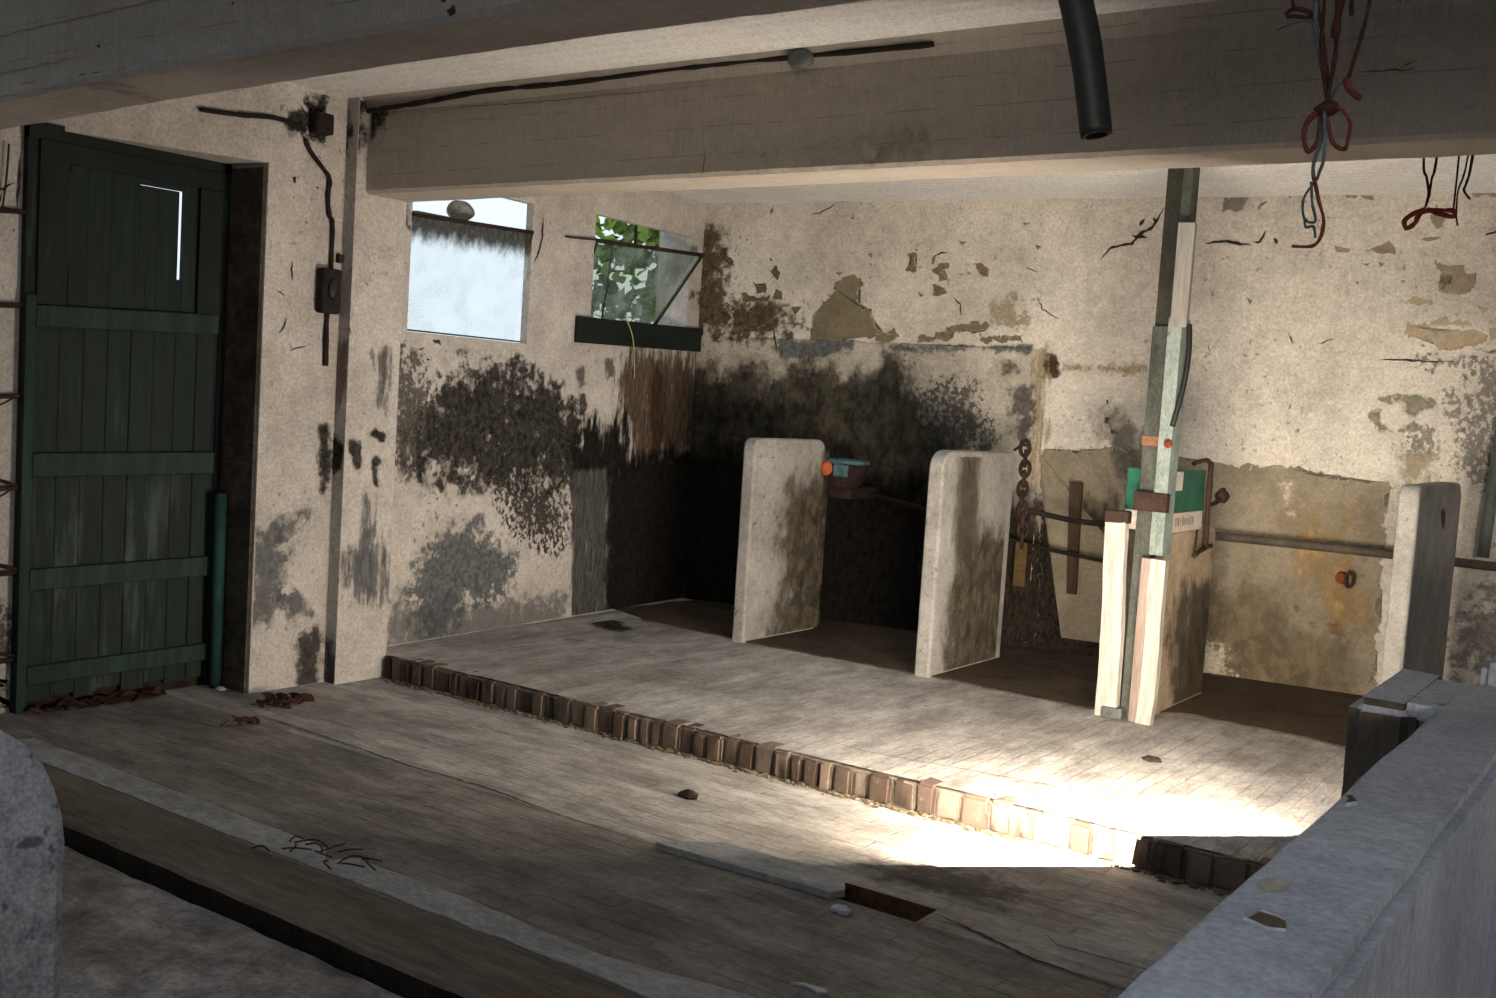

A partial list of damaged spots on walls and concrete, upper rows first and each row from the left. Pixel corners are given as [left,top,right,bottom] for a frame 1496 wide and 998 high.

peeling [719,247,735,267]
crack [1101,208,1164,259]
peeling [1333,241,1396,285]
peeling [1421,212,1447,242]
peeling [732,251,1024,345]
peeling [1401,260,1496,351]
water stain [778,338,854,359]
water stain [316,341,674,646]
water stain [253,510,335,686]